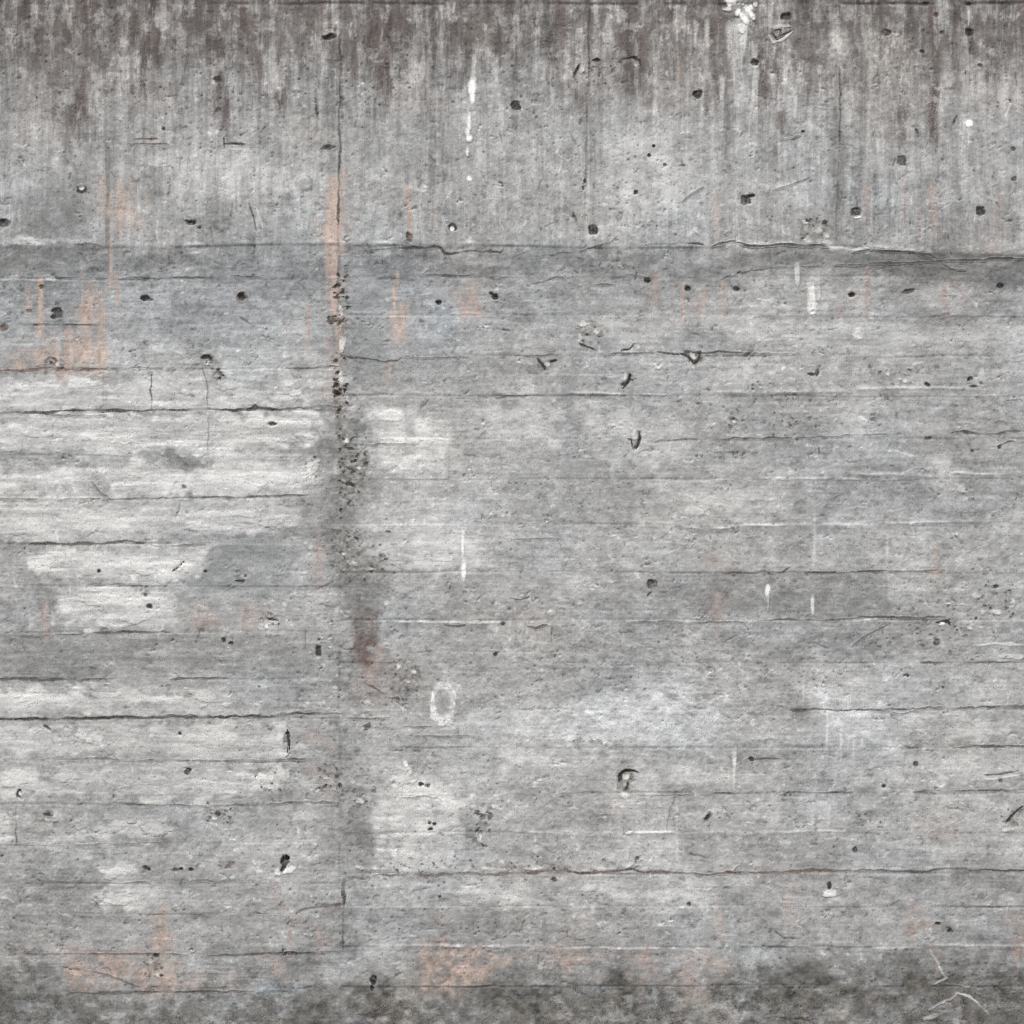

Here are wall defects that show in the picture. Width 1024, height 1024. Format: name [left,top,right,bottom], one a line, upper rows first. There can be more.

water stain [0,0,1024,334]
crack [644,63,1024,281]
rust [0,152,157,392]
crack [0,355,343,457]
rust [305,164,365,433]
water stain [345,264,406,449]
water stain [314,426,408,629]
crack [0,681,476,738]
water stain [322,801,385,883]
rust [335,590,401,713]
crack [400,793,442,801]
crack [373,864,1024,879]